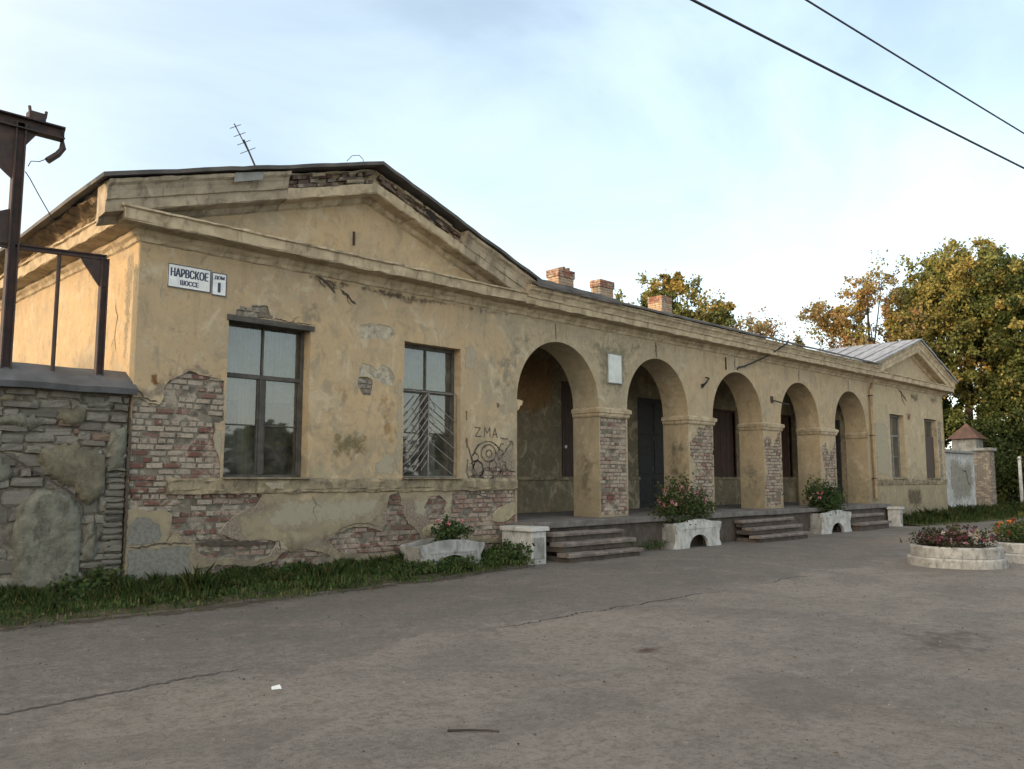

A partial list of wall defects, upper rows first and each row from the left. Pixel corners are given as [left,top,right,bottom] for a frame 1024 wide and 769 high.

flaking render [236,305,273,319]
crack [315,276,357,305]
flaking render [128,363,516,575]
flaking render [600,417,628,515]
flaking render [690,426,715,508]
flaking render [764,432,783,507]
flaking render [821,442,837,491]